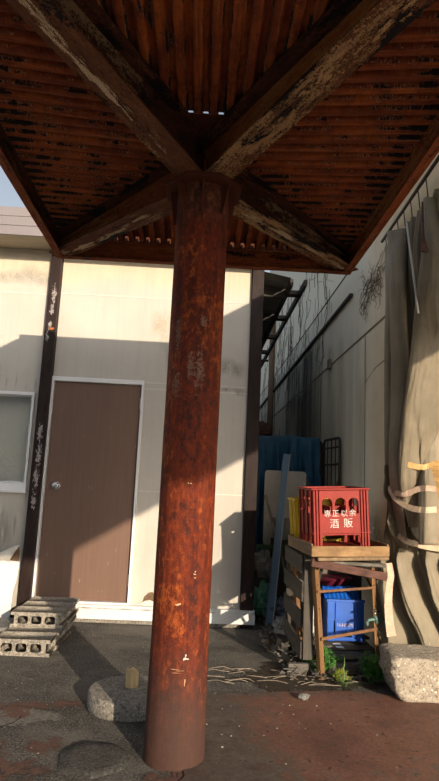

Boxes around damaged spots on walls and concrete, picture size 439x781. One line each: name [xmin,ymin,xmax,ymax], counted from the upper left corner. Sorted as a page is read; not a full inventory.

peeling [18,0,138,122]
peeling [298,0,421,97]
peeling [241,213,344,270]
peeling [30,424,43,510]